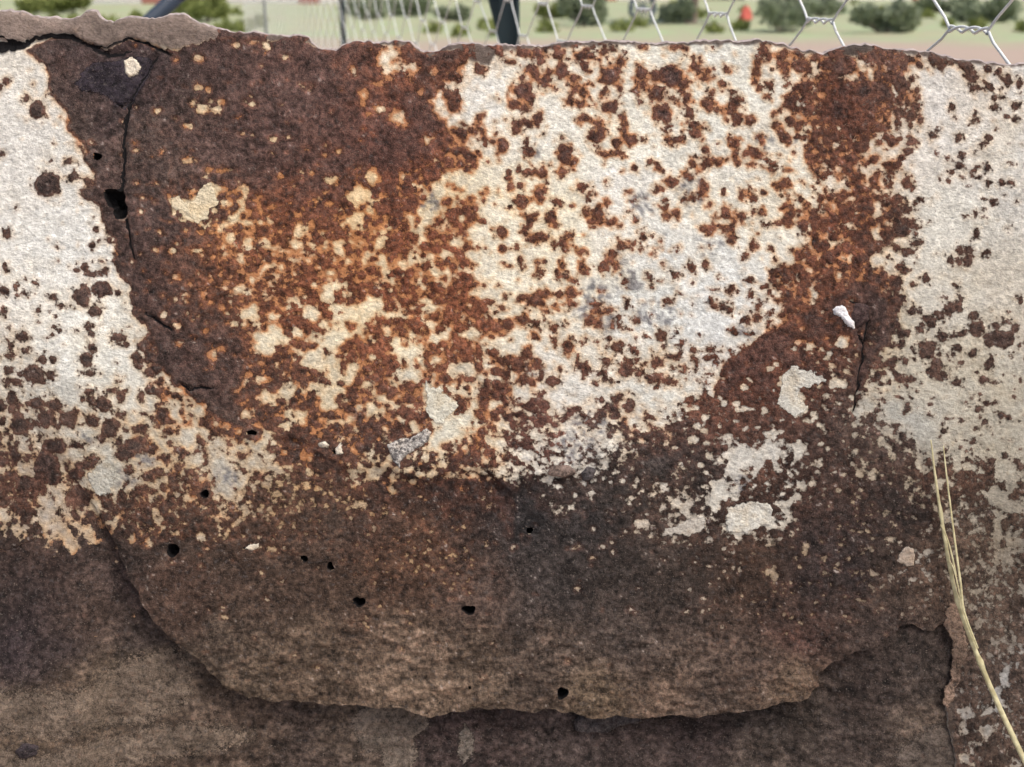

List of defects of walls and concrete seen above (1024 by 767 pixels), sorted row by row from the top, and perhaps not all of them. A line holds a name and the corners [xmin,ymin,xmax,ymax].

corrosion [29,170,63,201]
crack [0,33,171,192]
crack [125,218,135,259]
corrosion [487,42,647,161]
corrosion [504,162,653,289]
corrosion [631,63,707,148]
corrosion [646,41,784,222]
corrosion [928,52,1024,113]
corrosion [44,259,121,338]
corrosion [515,260,687,390]
crack [850,301,869,411]
corrosion [910,311,1021,386]